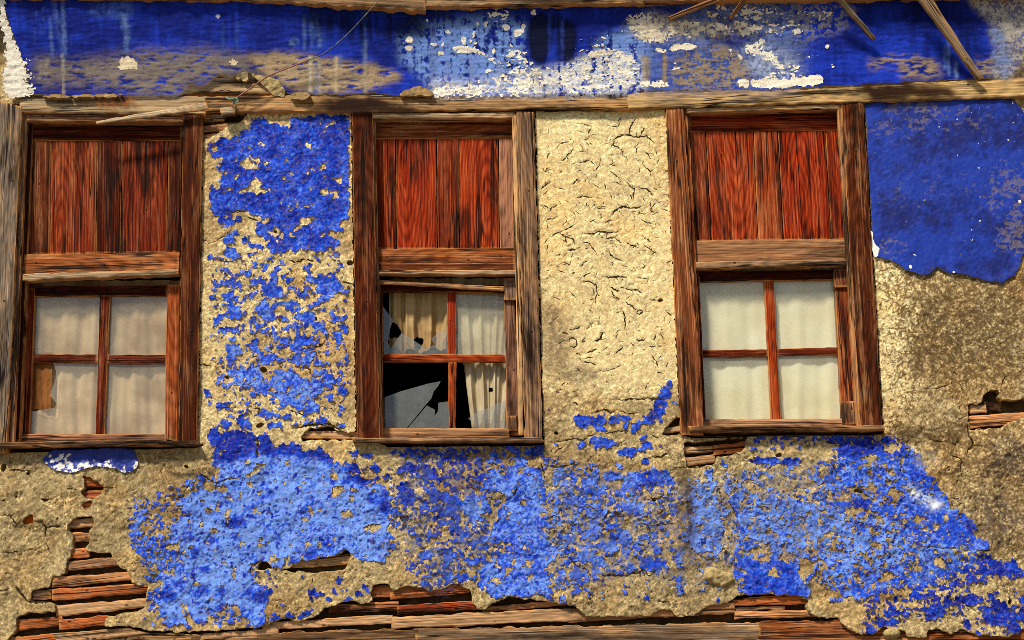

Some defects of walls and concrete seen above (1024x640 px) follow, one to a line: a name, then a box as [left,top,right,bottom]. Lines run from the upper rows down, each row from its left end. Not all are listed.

peeling [429,3,833,100]
peeling [203,114,357,441]
peeling [573,380,678,458]
crack [540,114,774,603]
crack [888,324,1012,508]
flaking render [967,391,1024,430]
peeling [9,402,1024,640]